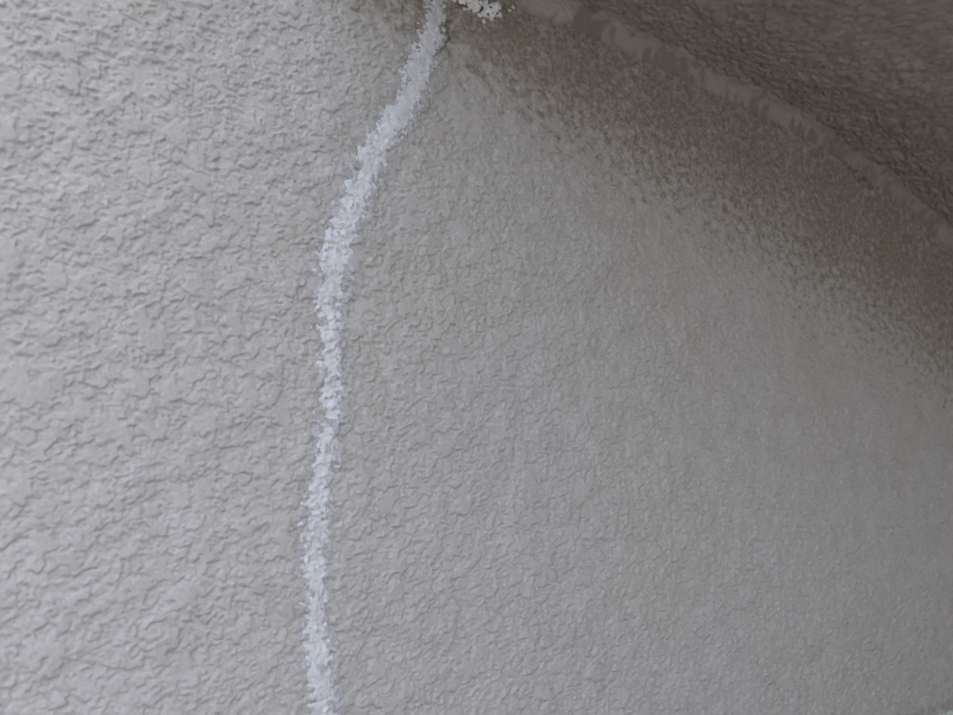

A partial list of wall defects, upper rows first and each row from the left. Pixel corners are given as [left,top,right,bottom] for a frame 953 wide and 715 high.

crack [295,0,452,715]